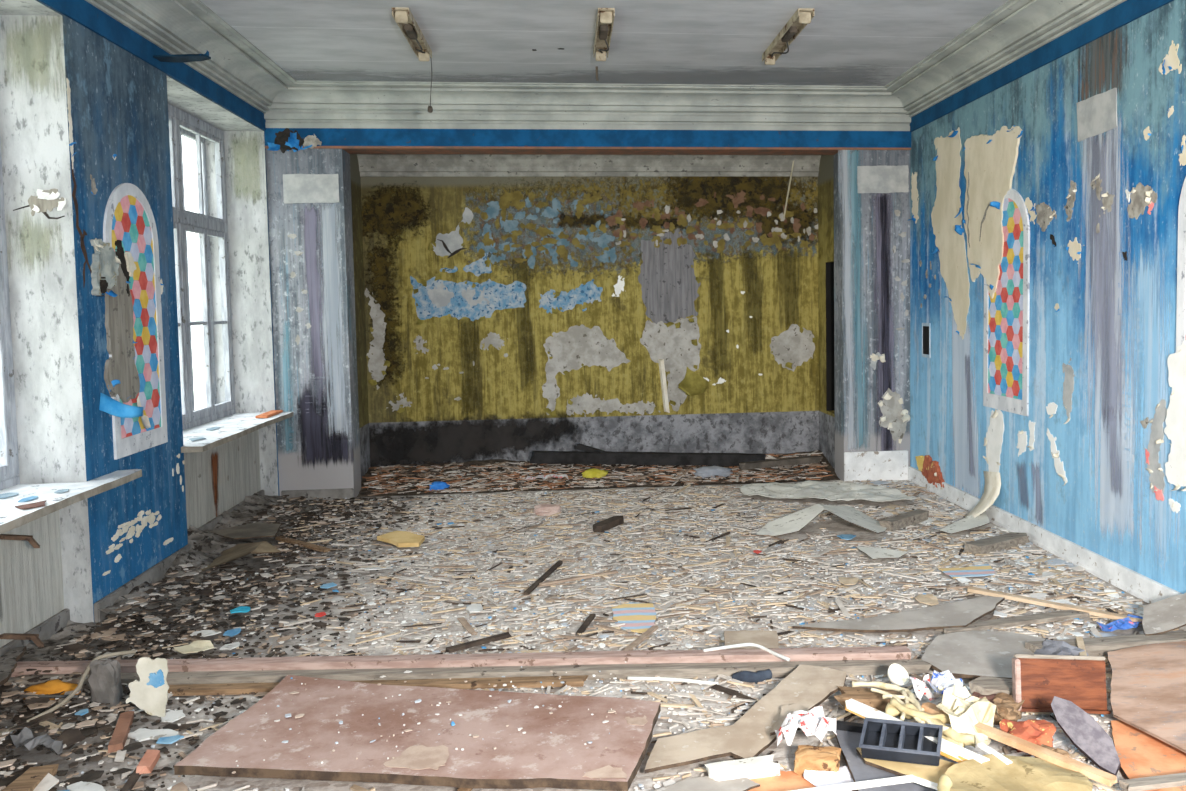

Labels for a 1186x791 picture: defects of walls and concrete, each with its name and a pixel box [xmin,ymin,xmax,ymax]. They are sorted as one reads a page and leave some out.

peeling [1159,40,1182,75]
peeling [99,263,151,429]
damp [283,204,354,467]
damp [362,183,430,387]
damp [369,414,583,467]
peeling [410,177,818,417]
peeling [857,125,1023,340]
peeling [965,358,1075,517]
flaking render [1025,174,1158,264]
peeling [1140,341,1186,513]
peeling [103,510,162,576]